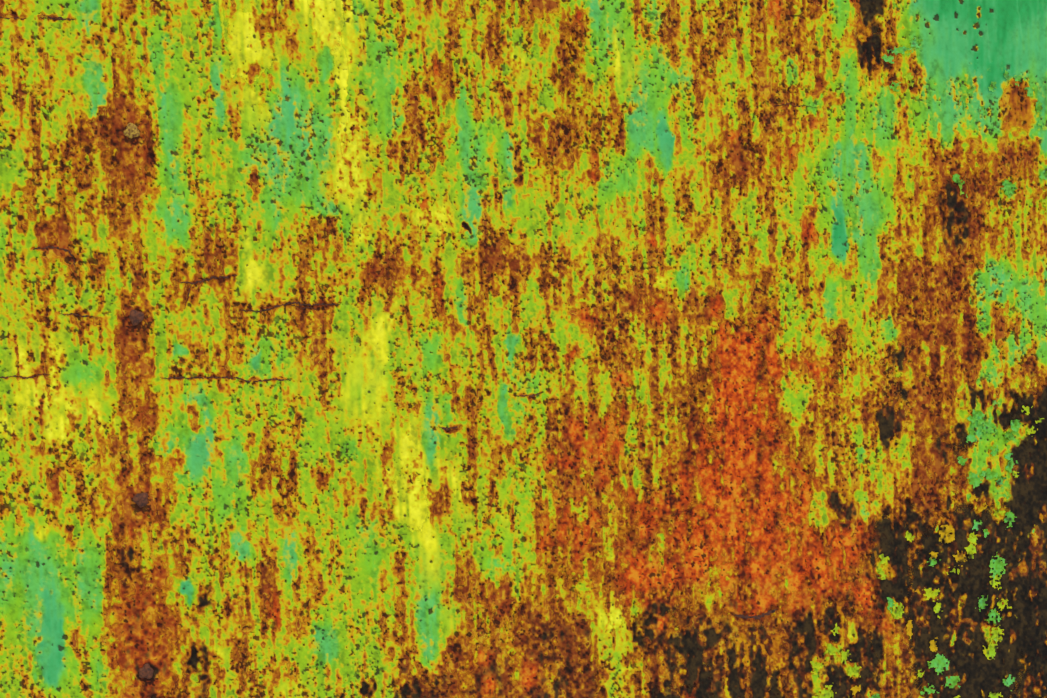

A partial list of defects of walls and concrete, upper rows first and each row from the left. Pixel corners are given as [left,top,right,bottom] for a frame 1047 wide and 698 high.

crack [0,14,75,22]
corrosion [715,0,802,192]
corrosion [800,202,824,249]
crack [239,302,340,312]
crack [0,372,49,380]
corrosion [14,0,183,698]
crack [160,375,291,383]
corrosion [441,261,911,698]
peeling [927,398,1044,575]
peeling [975,555,1012,660]
peeling [810,623,880,698]
peeling [917,637,961,698]